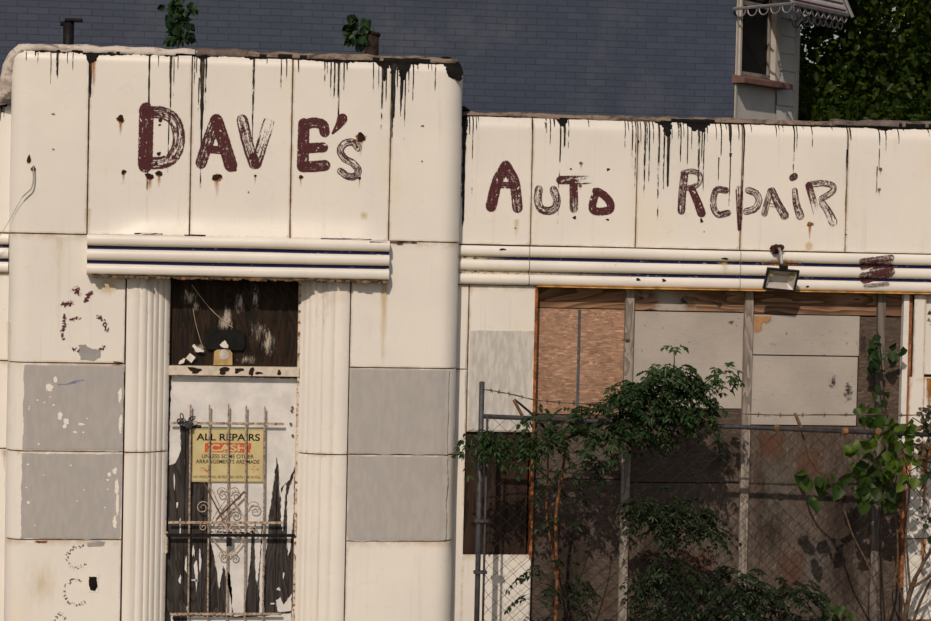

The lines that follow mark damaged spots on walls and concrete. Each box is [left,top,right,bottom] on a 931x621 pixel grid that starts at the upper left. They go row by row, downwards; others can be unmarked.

water stain [148,55,179,170]
water stain [194,57,207,158]
water stain [324,62,348,115]
water stain [373,62,436,137]
rust [145,152,162,184]
water stain [461,116,479,226]
water stain [545,119,569,210]
water stain [624,121,752,218]
peeling [168,367,297,621]